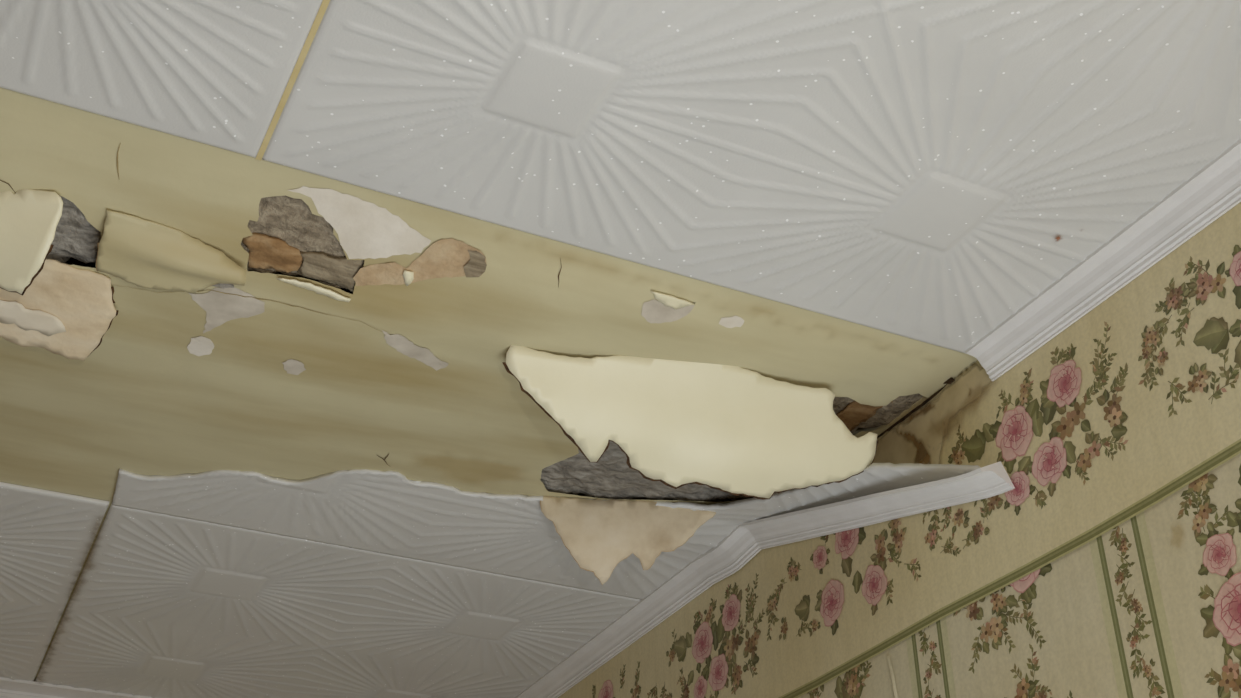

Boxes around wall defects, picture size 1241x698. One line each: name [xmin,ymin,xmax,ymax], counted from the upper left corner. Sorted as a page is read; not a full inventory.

flaking render [0,186,487,361]
peeling [283,359,306,375]
peeling [382,330,449,371]
peeling [502,345,922,585]